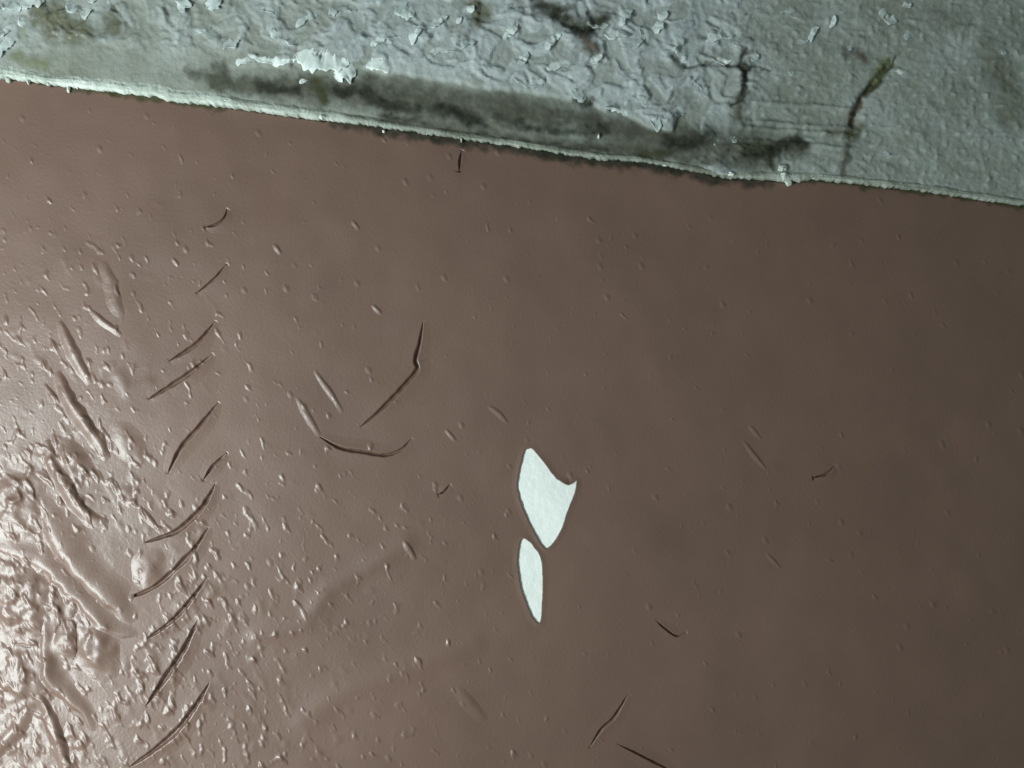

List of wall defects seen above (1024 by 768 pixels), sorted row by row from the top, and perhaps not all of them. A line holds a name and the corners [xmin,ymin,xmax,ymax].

leakage [70,88,223,110]
crack [452,151,468,171]
leakage [189,65,808,187]
flaking render [0,0,1024,207]
crack [673,37,768,126]
leakage [842,182,946,198]
crack [316,321,431,467]
crack [127,262,229,768]
peeling [512,442,582,630]
crack [586,692,678,768]